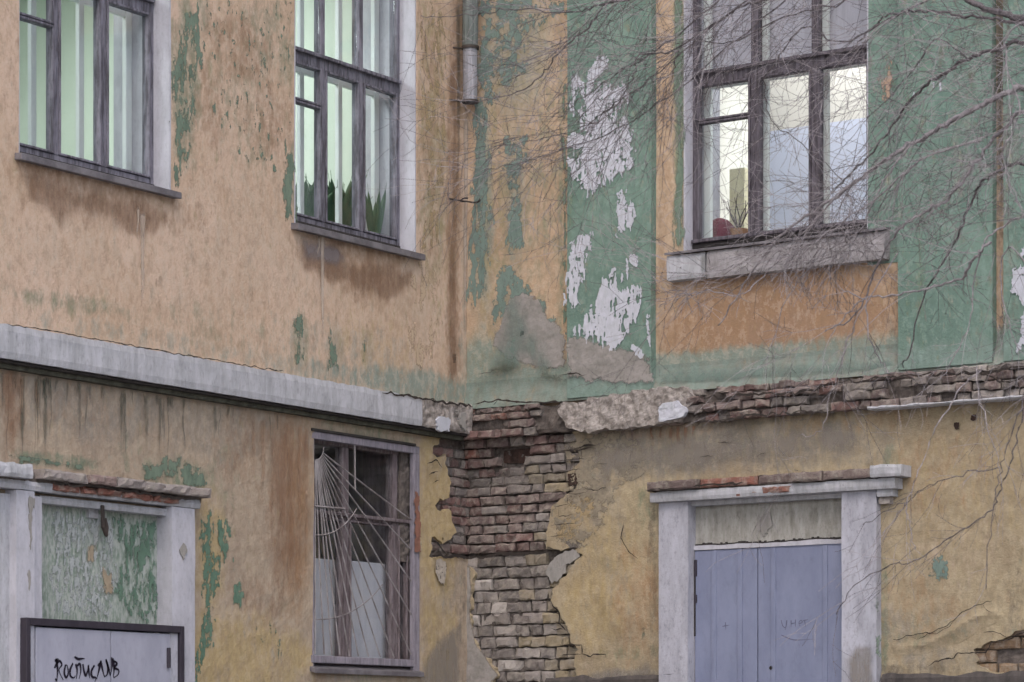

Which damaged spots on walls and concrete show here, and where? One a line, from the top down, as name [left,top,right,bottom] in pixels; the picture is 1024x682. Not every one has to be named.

peeling [169,0,298,219]
flaking render [397,0,1024,682]
peeling [142,455,207,487]
peeling [49,507,158,623]
peeling [195,509,234,682]